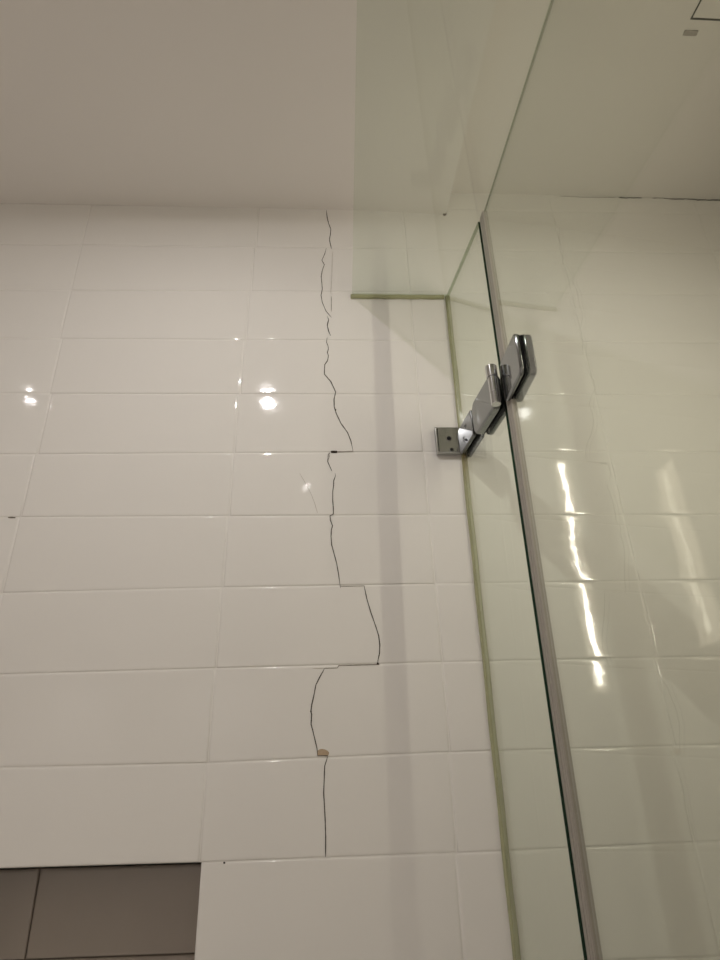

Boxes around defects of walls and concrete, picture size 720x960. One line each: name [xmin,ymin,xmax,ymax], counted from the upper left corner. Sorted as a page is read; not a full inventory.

crack [300,210,353,588]
crack [310,586,380,857]